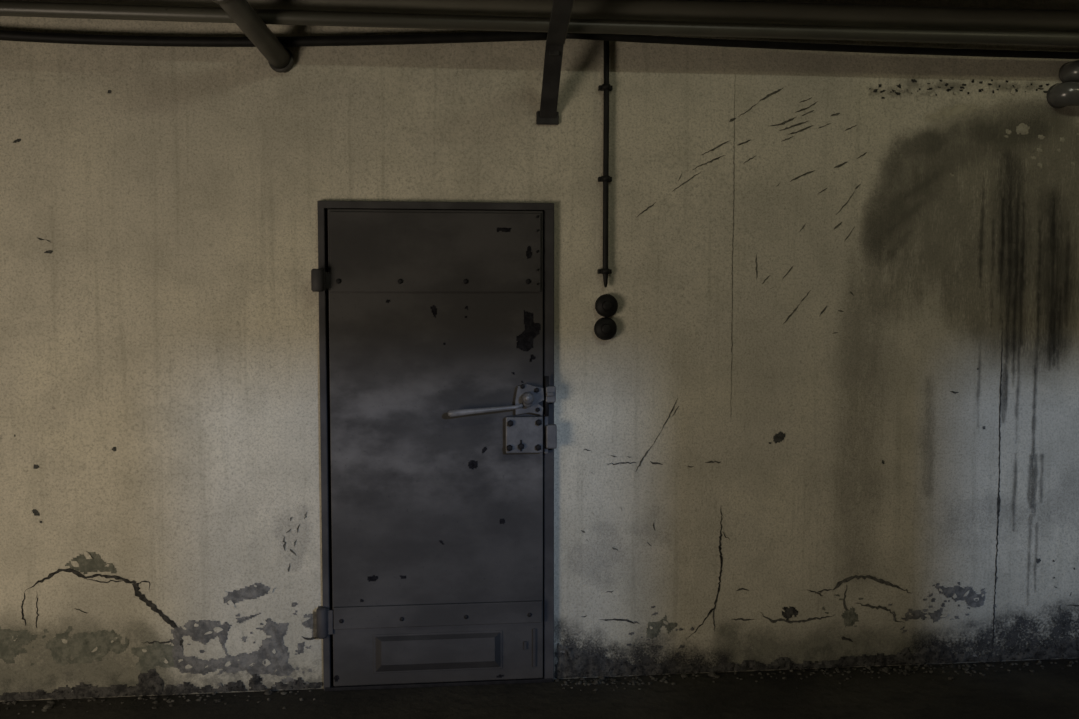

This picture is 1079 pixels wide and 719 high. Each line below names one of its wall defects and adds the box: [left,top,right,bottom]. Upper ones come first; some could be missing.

crack [21,568,184,648]
peeling [0,583,339,701]
crack [689,513,910,637]
flaking render [554,582,1079,679]